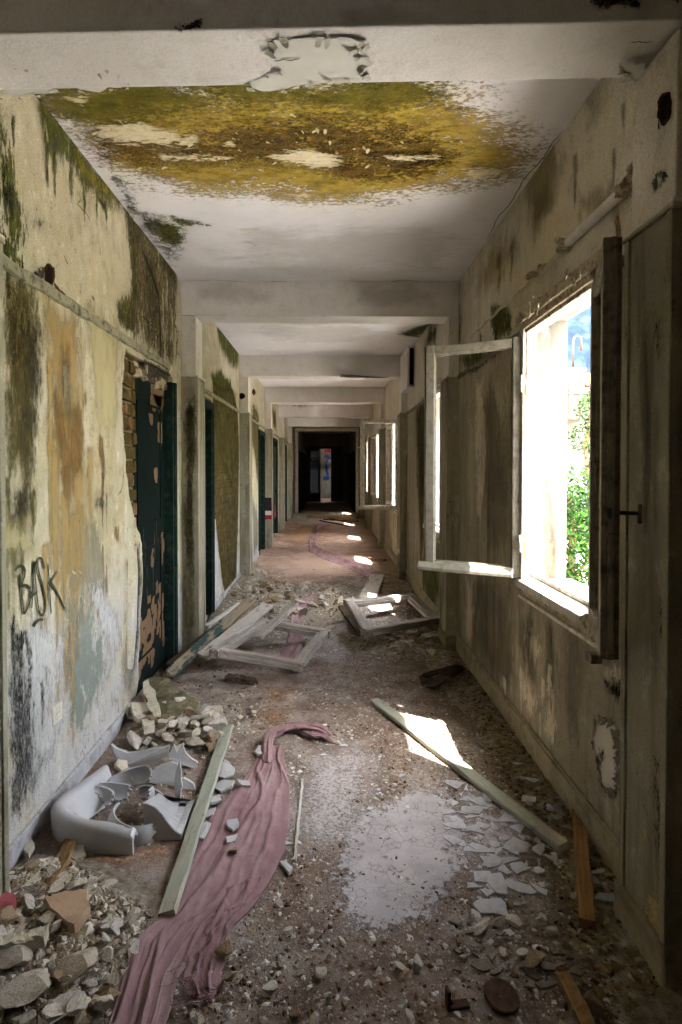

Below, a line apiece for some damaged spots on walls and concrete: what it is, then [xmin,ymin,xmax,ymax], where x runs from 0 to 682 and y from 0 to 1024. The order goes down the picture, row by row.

peeling [246,36,374,94]
hole [657,92,672,129]
water stain [38,100,212,426]
water stain [0,107,122,816]
flaking render [122,352,172,526]
peeling [142,532,165,567]
spalling [138,581,165,718]
peeling [591,715,620,799]